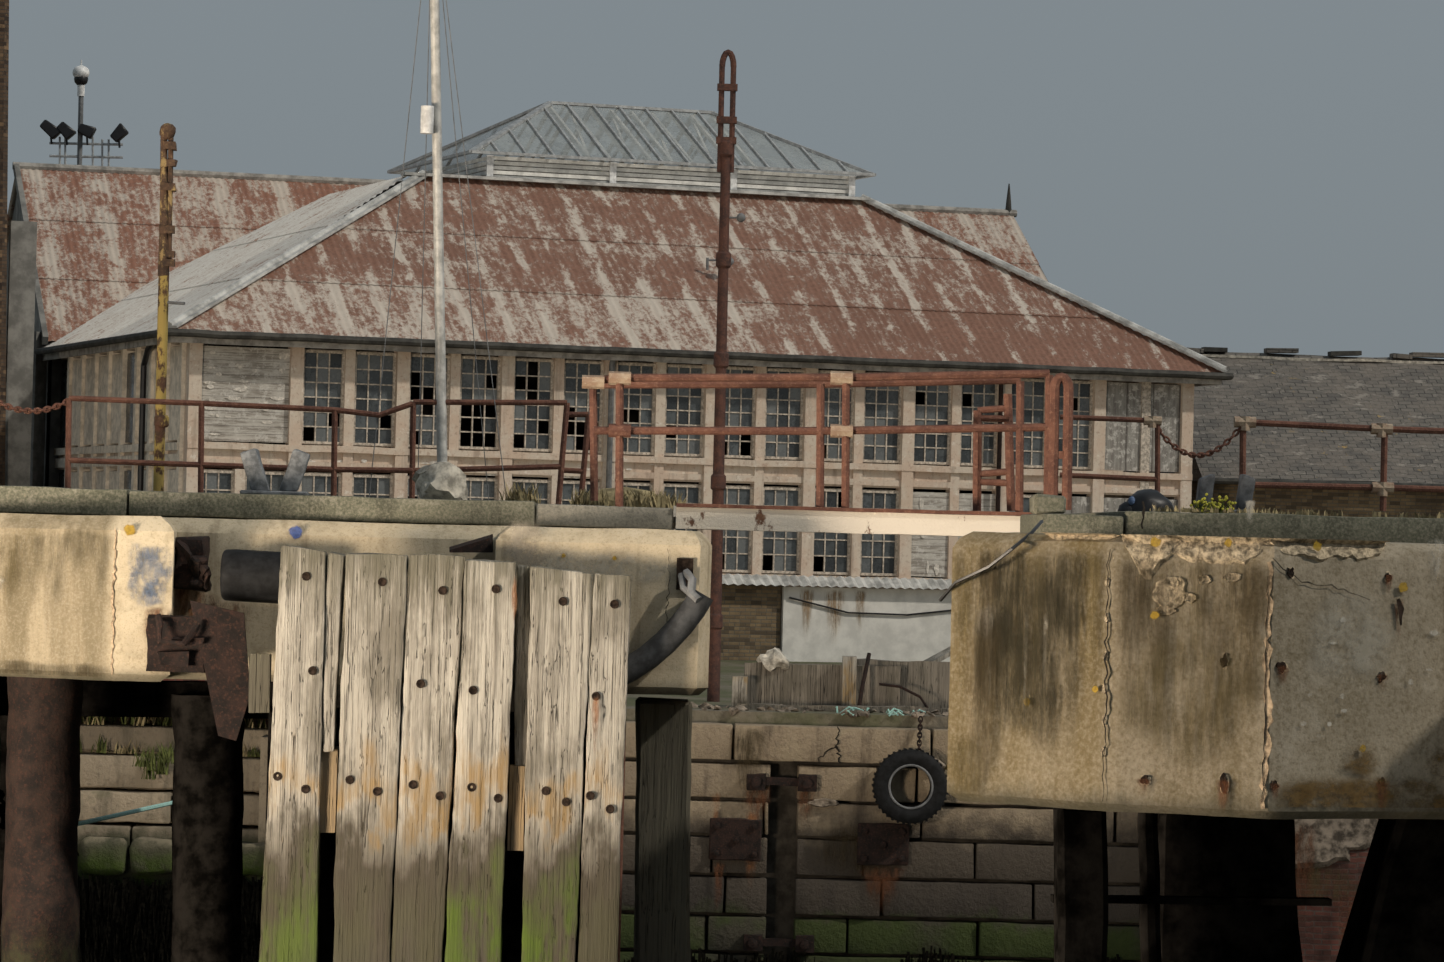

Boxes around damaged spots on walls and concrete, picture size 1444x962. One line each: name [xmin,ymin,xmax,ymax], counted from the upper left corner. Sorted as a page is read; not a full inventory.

crack [1139,501,1147,529]
leakage [131,549,170,604]
leakage [954,553,1099,747]
crack [1100,549,1111,801]
leakage [1120,568,1229,747]
spalling [1040,532,1389,615]
corrosion [1396,598,1404,625]